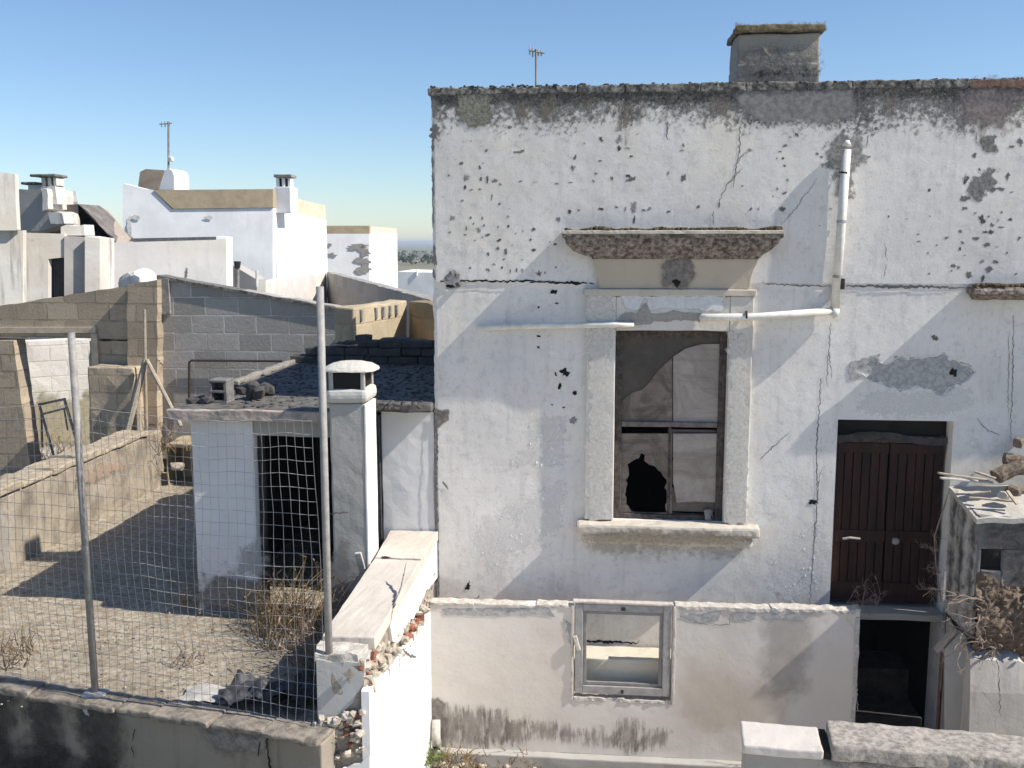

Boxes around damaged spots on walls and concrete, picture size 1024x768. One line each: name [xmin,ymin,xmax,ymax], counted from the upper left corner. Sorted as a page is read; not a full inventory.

leakage [432,95,459,136]
leakage [474,43,1024,136]
crack [712,127,745,225]
spalling [816,130,870,199]
peeling [916,121,1023,282]
spalling [327,243,372,274]
spalling [849,353,976,397]
crack [977,315,1014,439]
crack [809,323,832,605]
crack [390,561,407,624]
leakage [431,699,447,736]